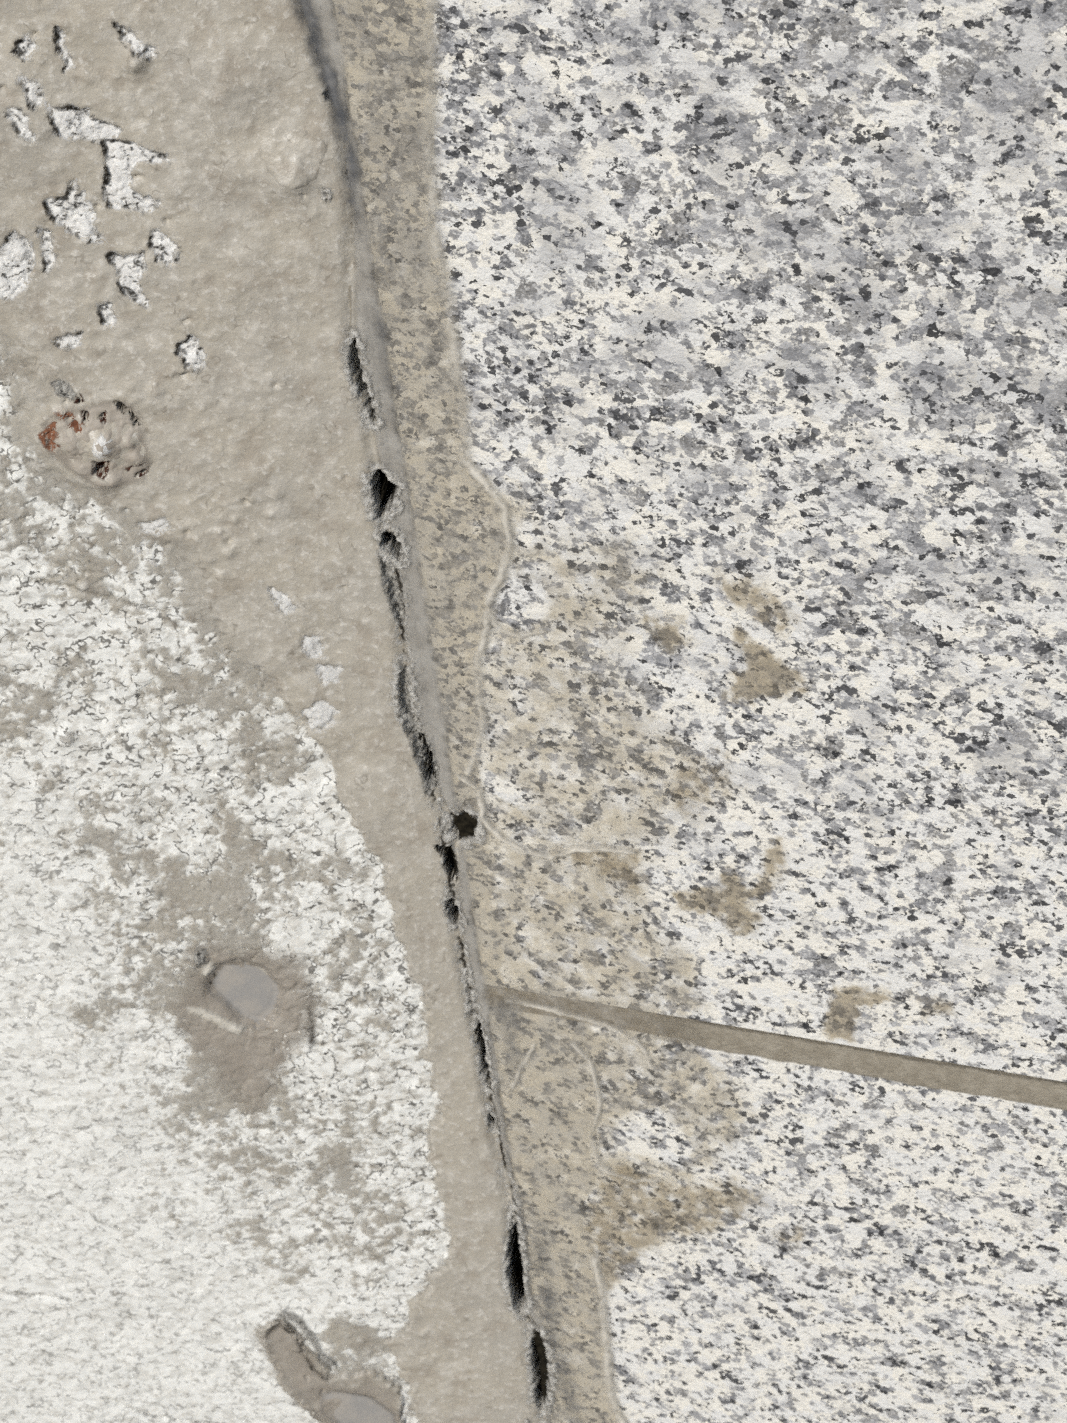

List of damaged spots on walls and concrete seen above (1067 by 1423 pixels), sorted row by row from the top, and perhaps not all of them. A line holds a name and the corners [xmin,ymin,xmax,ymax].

peeling [0,21,181,328]
peeling [52,331,83,351]
peeling [173,334,206,373]
crack [338,328,386,431]
crack [378,555,558,1423]